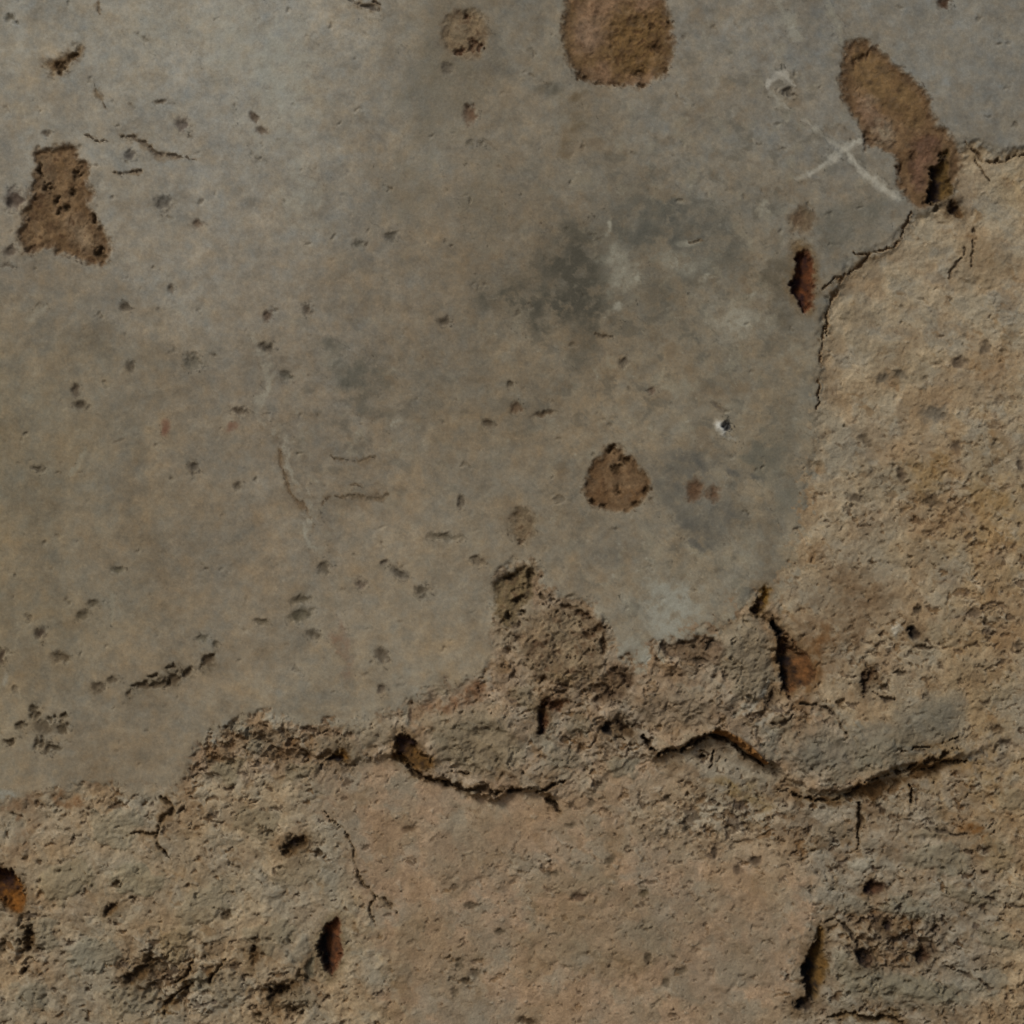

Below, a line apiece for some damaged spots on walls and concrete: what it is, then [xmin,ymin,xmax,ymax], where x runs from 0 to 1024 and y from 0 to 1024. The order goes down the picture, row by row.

spalling [440,9,493,78]
spalling [560,0,678,92]
spalling [0,130,114,271]
crack [816,214,913,410]
spalling [580,444,656,514]
spalling [656,38,1024,1024]
crack [641,715,775,770]
spalling [0,555,855,1024]
crack [404,765,567,814]
crack [791,736,968,852]
crack [972,893,1024,910]
crack [947,966,1014,992]